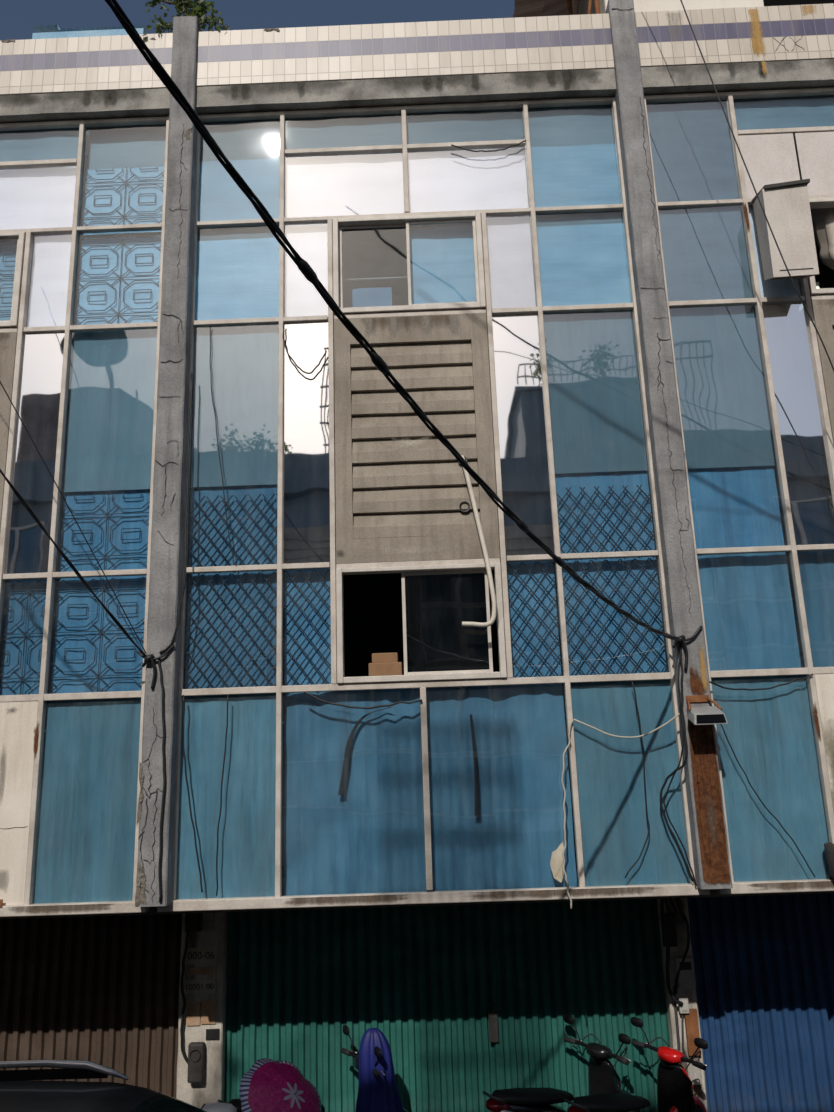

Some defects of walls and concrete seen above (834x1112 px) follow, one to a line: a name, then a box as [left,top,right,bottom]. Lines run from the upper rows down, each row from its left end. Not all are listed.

crack [155,440,179,545]
crack [657,317,691,612]
crack [138,710,166,902]
corrosion [687,710,731,884]
leakage [824,736,834,775]
spalling [135,861,147,907]
leakage [751,881,834,889]